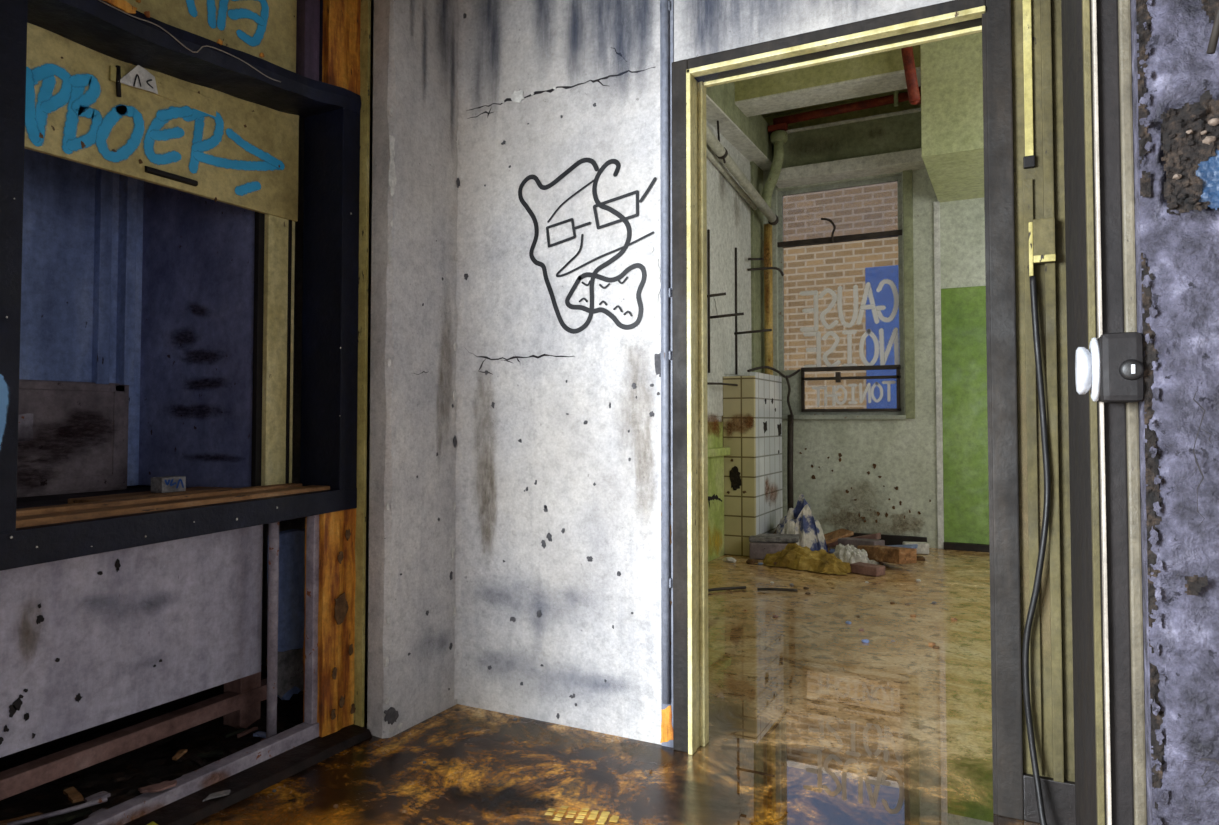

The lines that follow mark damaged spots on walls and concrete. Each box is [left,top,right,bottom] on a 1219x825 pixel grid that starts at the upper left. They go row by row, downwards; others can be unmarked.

damp [597,0,624,56]
crack [466,48,655,119]
spalling [1136,0,1219,215]
crack [465,348,573,374]
rust [708,416,753,435]
spalling [727,459,746,494]
crack [708,494,722,506]
damp [451,786,548,811]